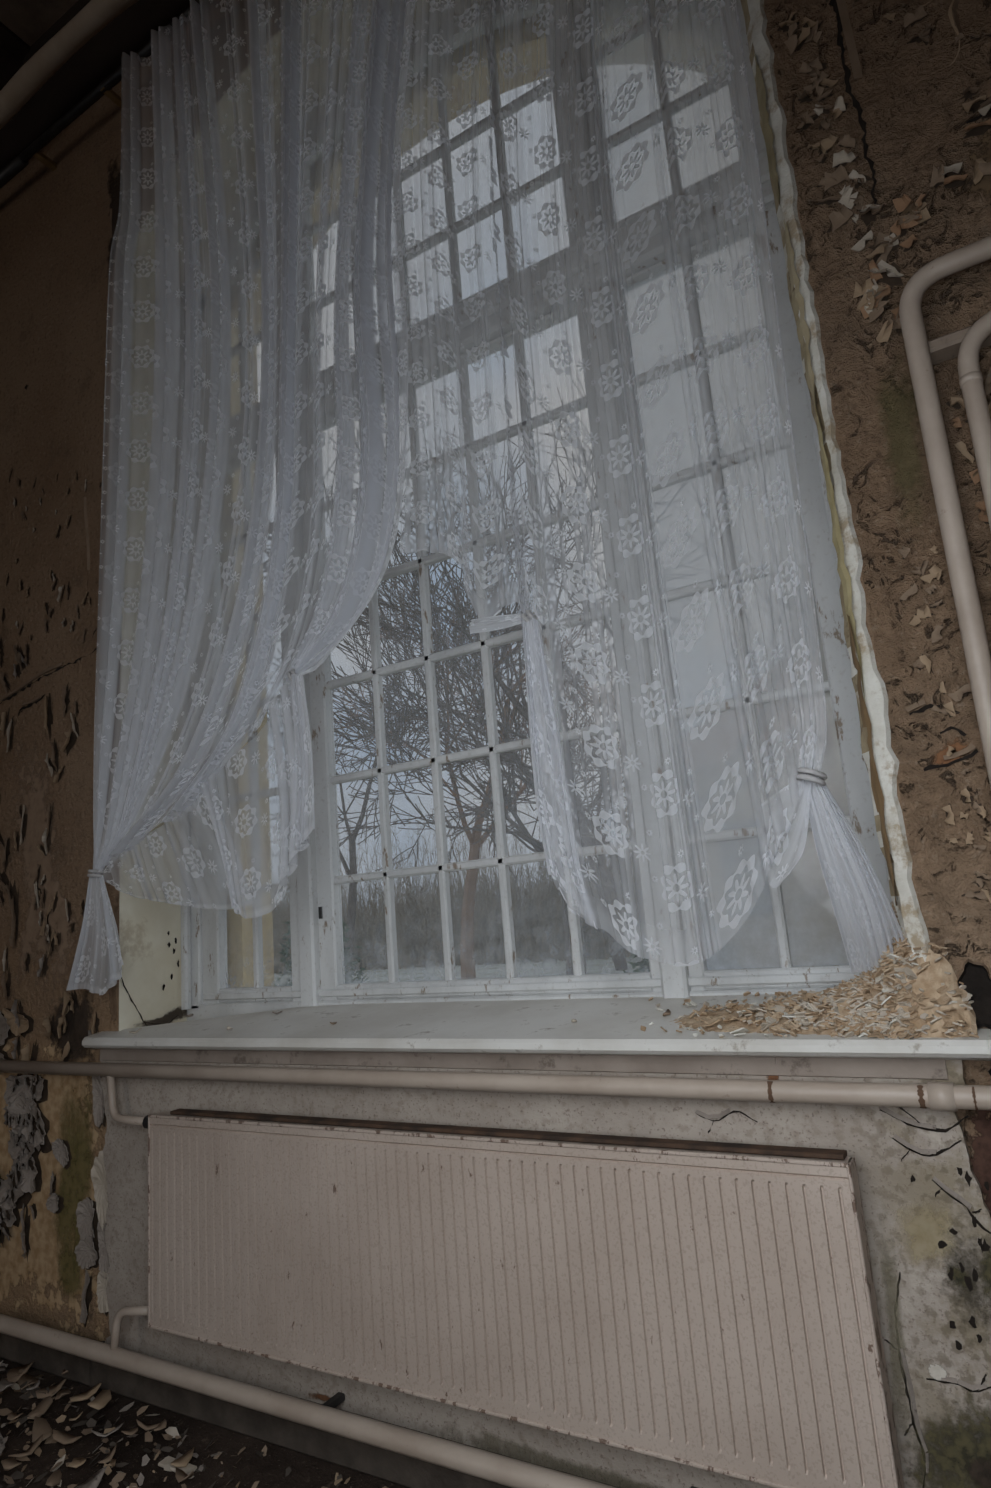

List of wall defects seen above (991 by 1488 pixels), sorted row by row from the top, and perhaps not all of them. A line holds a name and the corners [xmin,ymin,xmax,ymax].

crack [829,0,877,205]
spalling [740,0,991,961]
peeling [0,558,92,753]
peeling [44,682,79,783]
peeling [0,802,117,1341]
spalling [957,959,991,1030]
spalling [968,1110,991,1213]